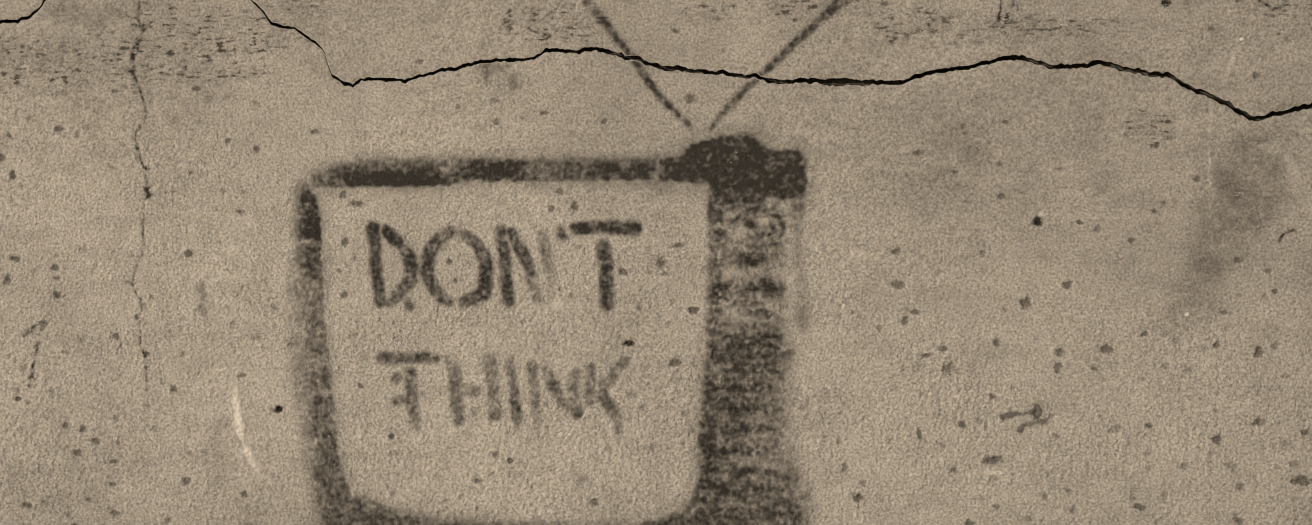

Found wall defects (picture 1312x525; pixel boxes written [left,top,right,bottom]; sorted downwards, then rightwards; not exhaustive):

crack [0,0,46,24]
crack [130,7,150,198]
crack [251,0,1312,121]
crack [23,321,45,387]